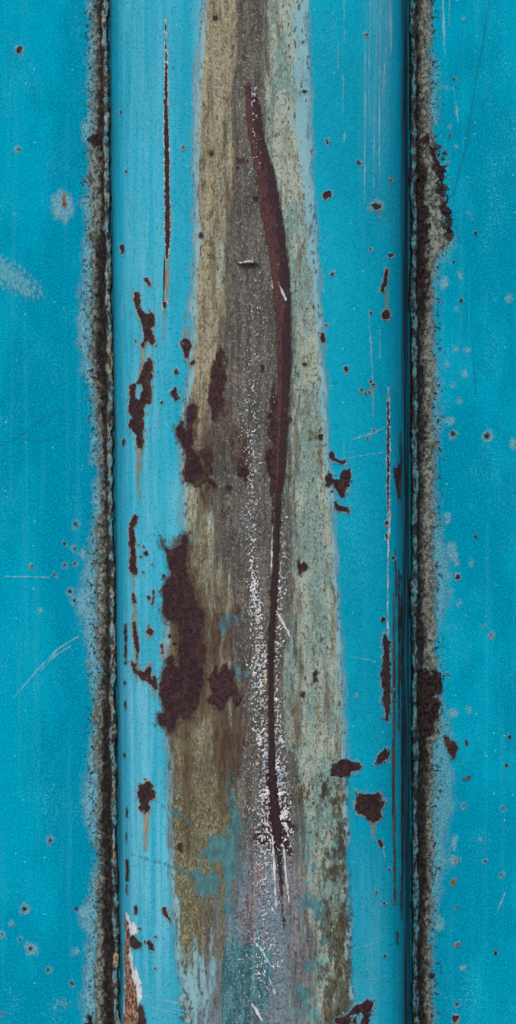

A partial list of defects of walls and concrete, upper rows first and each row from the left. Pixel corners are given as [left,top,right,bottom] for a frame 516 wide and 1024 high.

corrosion [81,0,146,1024]
corrosion [127,289,157,491]
corrosion [173,347,250,516]
peeling [160,0,356,1024]
corrosion [235,84,295,928]
corrosion [325,451,353,516]
corrosion [354,0,458,1024]
peeling [145,620,175,667]
corrosion [128,514,248,853]
corrosion [322,757,363,796]
corrosion [333,998,375,1024]